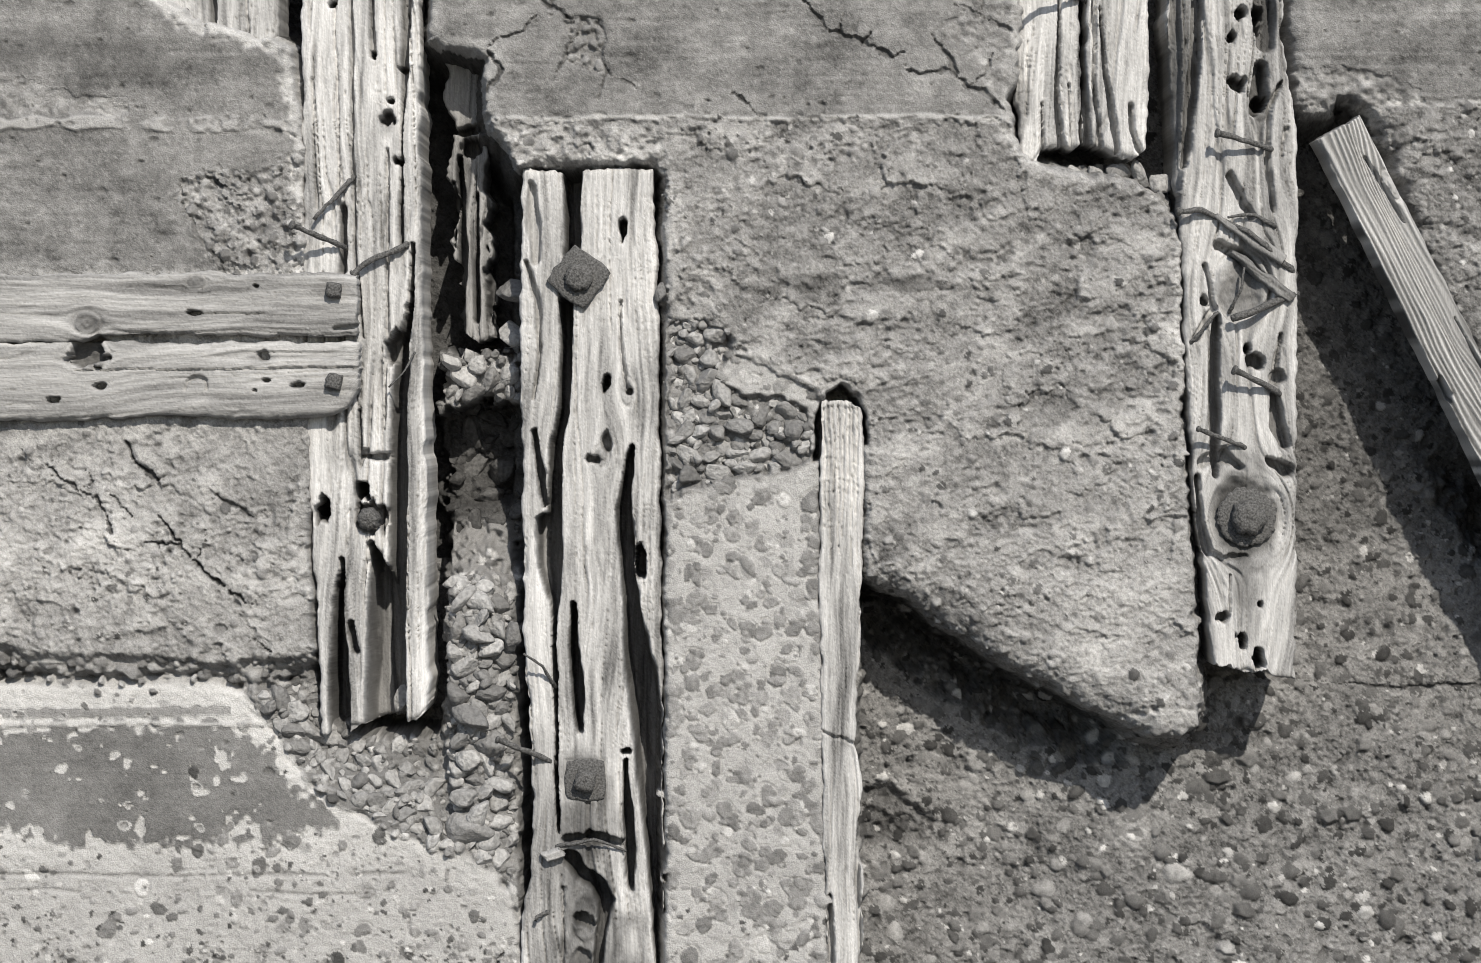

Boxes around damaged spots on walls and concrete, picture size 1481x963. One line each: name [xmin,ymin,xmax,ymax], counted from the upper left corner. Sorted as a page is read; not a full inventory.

crack [486,0,575,93]
crack [596,65,635,101]
crack [801,0,1014,112]
spalling [174,150,307,275]
crack [125,440,161,484]
crack [45,463,246,604]
crack [215,494,258,520]
spalling [663,320,813,499]
peeling [0,346,525,883]